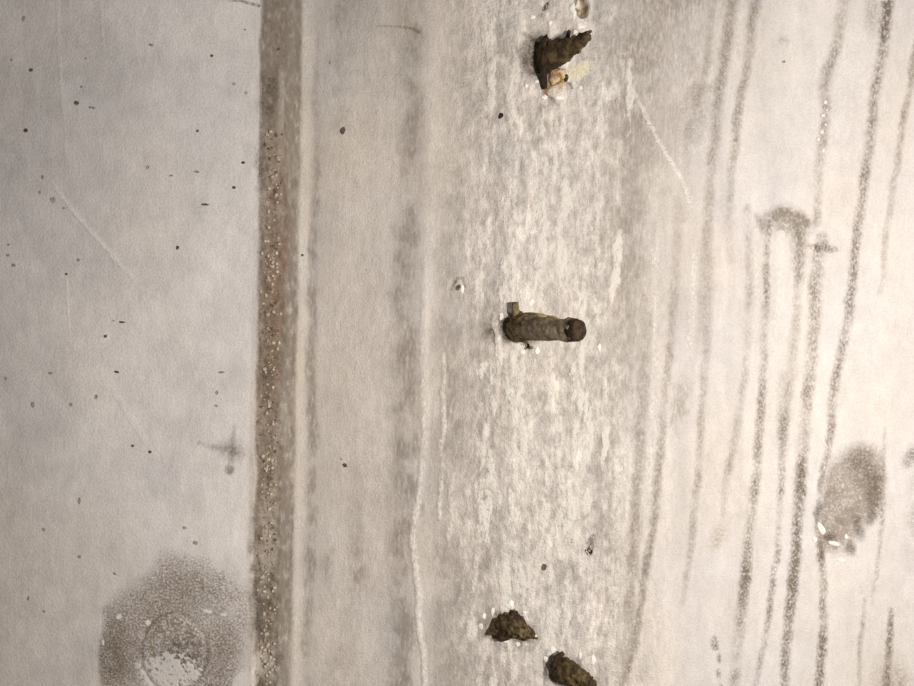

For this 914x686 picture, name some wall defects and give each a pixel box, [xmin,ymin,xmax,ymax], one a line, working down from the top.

water stain [881,0,893,54]
water stain [100,561,271,686]
rust [485,609,538,642]